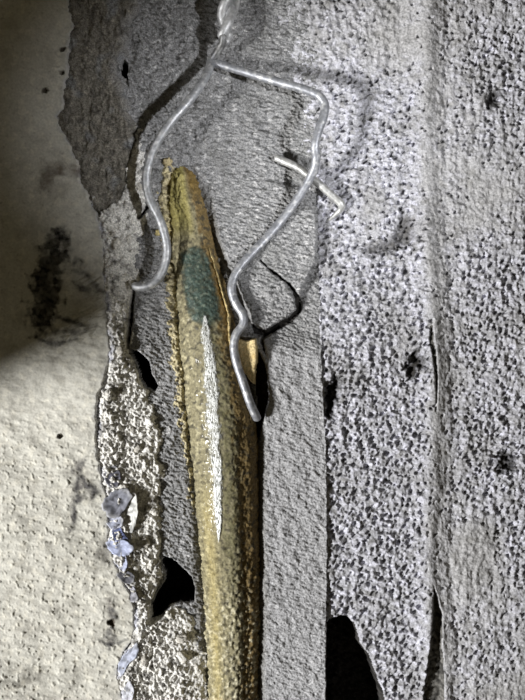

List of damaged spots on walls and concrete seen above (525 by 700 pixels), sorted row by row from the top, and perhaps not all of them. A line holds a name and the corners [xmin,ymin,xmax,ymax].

water stain [28,227,83,346]
spalling [57,0,208,700]
peeling [238,338,258,384]
crack [252,261,301,355]
crack [423,589,444,700]